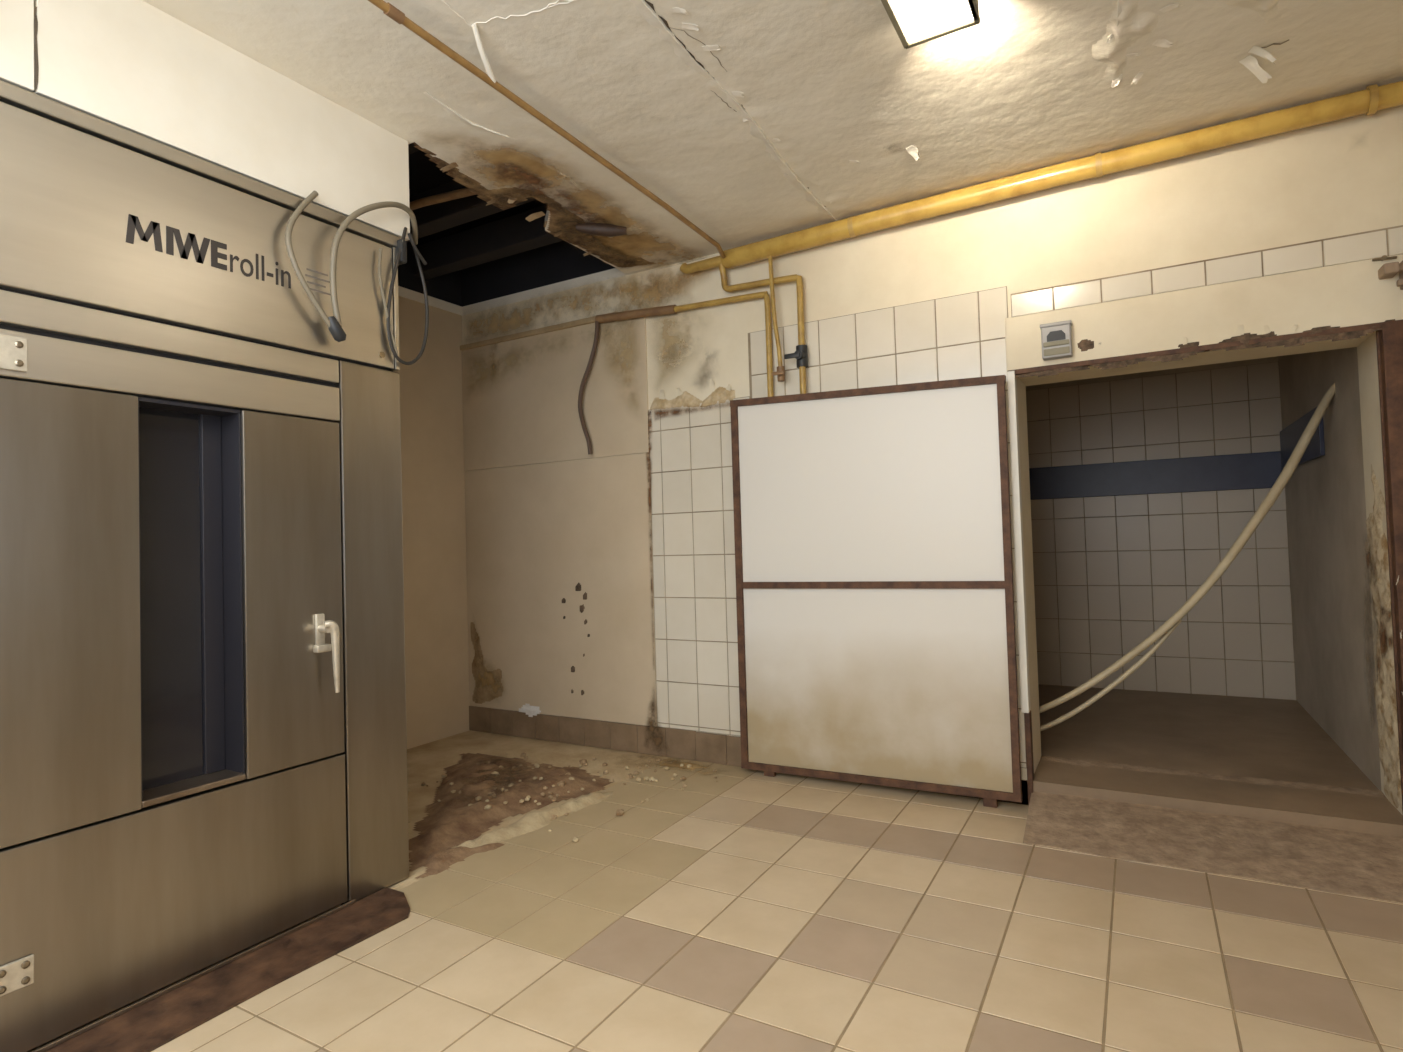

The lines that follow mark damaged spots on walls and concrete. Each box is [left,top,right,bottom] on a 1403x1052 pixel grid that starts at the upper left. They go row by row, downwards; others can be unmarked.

crack [629,0,837,221]
peeling [1092,0,1183,88]
peeling [1239,40,1289,83]
spalling [413,142,656,267]
water stain [423,92,701,335]
spalling [470,622,503,704]